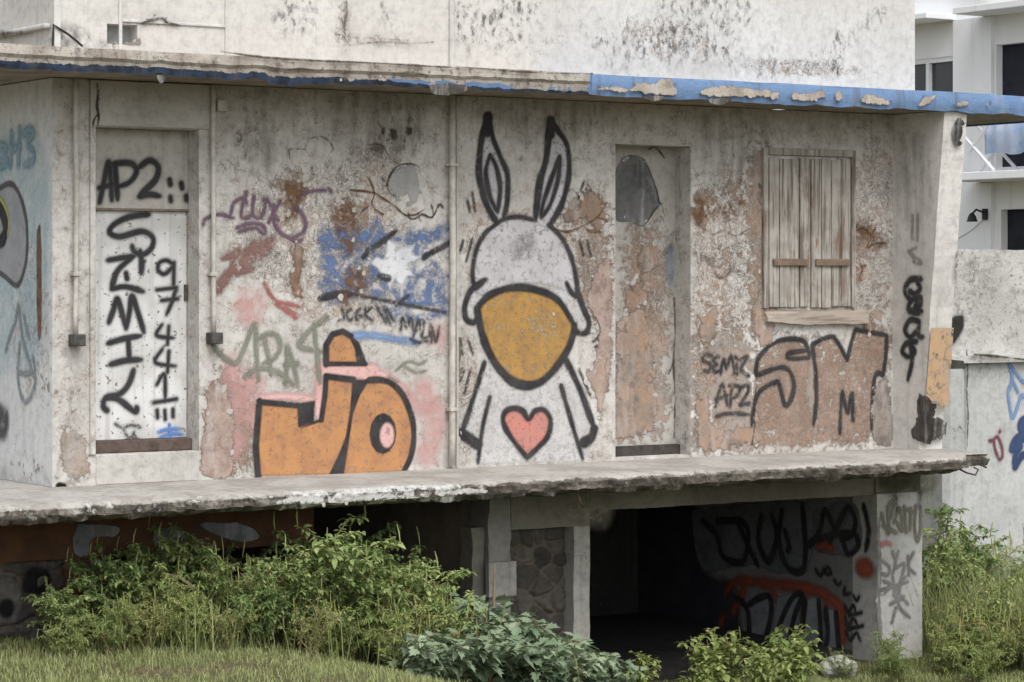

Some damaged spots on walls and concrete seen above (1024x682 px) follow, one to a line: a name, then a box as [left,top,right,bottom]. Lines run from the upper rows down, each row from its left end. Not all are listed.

peeling [598,78,677,101]
peeling [700,84,843,105]
peeling [861,94,893,105]
peeling [918,95,936,106]
spalling [558,153,660,233]
peeling [750,269,779,350]
peeling [698,308,719,348]
peeling [693,391,762,452]
peeling [276,493,416,507]
peeling [435,485,488,496]